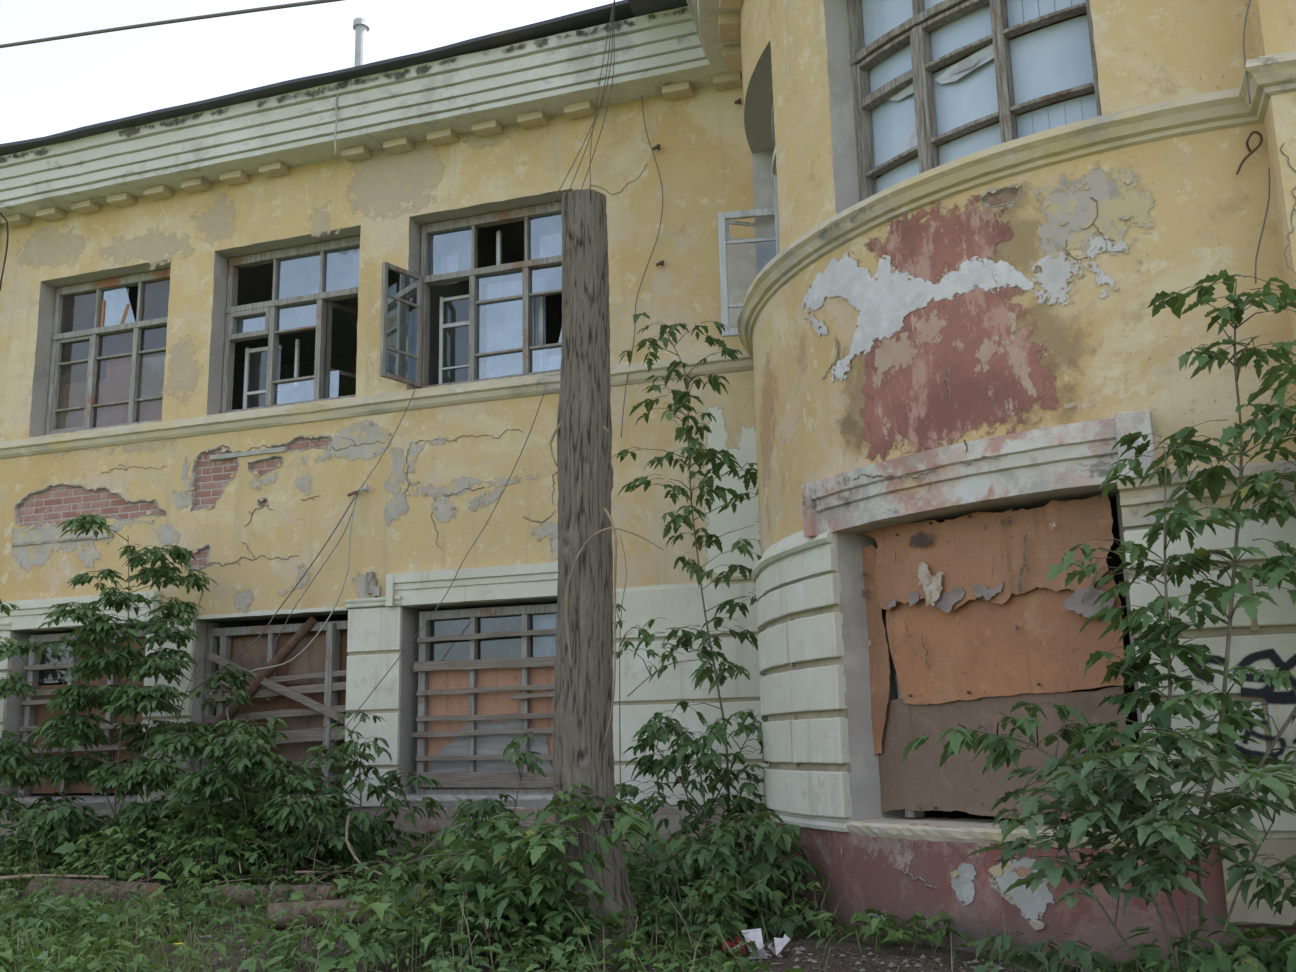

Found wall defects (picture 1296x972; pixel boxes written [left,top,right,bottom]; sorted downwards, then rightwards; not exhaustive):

crack [1280,143,1296,281]
peeling [800,151,1155,463]
crack [101,464,164,473]
spalling [10,419,539,572]
peeling [530,521,558,560]
peeling [950,857,1054,930]